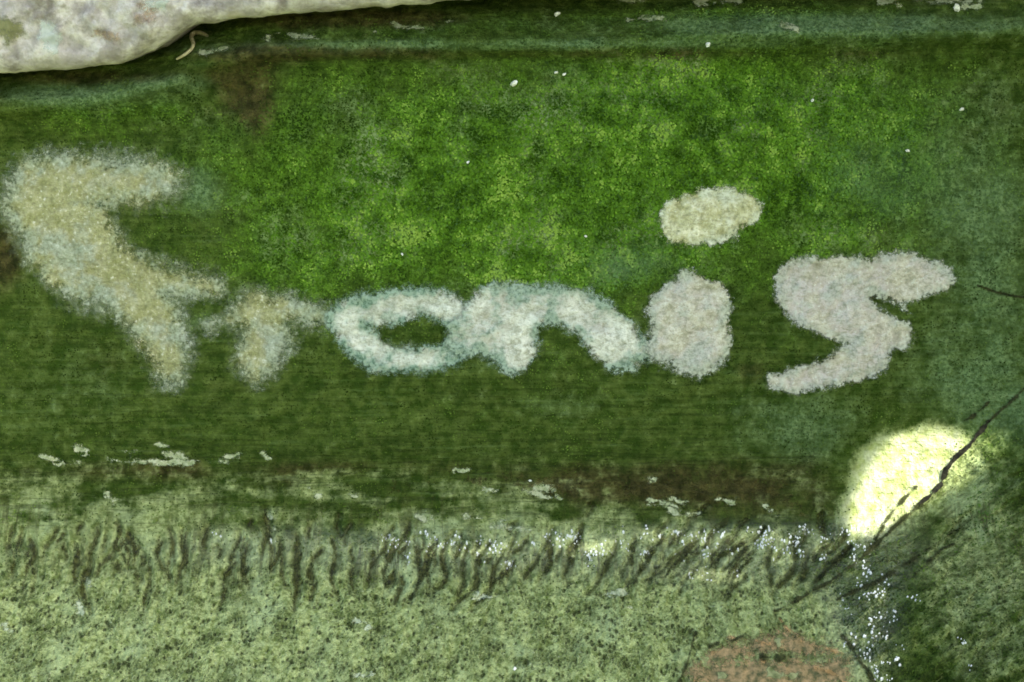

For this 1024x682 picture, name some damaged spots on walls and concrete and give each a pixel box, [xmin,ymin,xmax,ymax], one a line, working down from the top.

damp [5,523,188,615]
damp [216,537,249,609]
damp [247,509,583,612]
damp [586,468,849,599]
crack [774,388,1024,612]